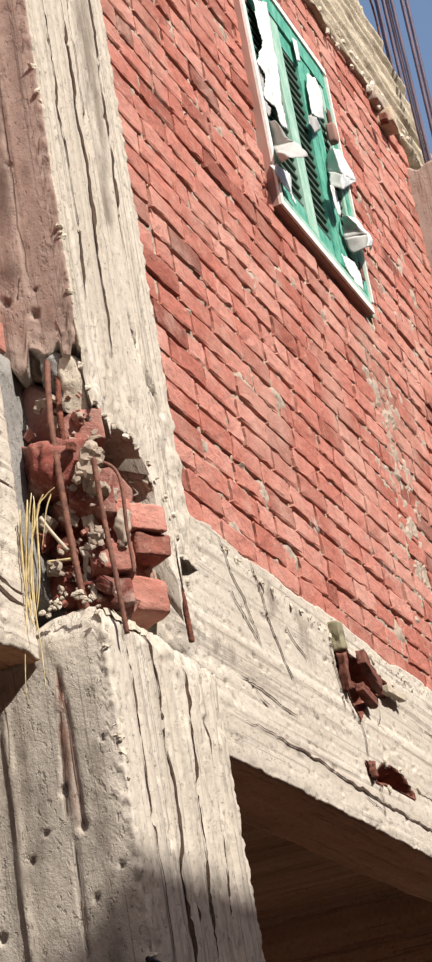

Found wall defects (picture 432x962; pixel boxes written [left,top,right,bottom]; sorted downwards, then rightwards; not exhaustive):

peeling [326,27,385,111]
spalling [374,0,432,164]
crack [42,0,136,348]
spalling [21,359,195,643]
crack [0,575,24,605]
crack [57,673,83,819]
peeling [112,717,129,763]
crack [218,536,308,684]
crack [241,675,432,831]
spalling [334,644,429,720]
spalling [365,758,421,800]
crack [75,846,90,955]